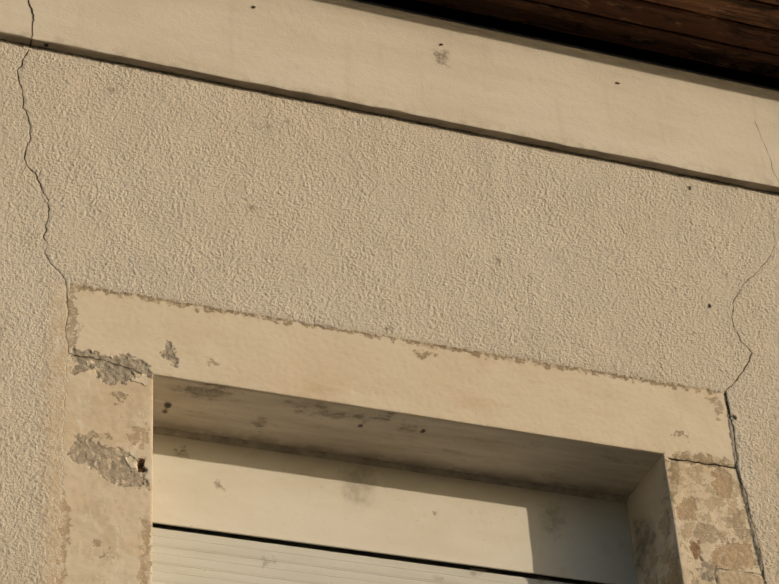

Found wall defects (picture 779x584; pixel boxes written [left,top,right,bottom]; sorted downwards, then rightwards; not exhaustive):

crack [17,0,153,379]
spalling [67,423,149,487]
spalling [66,288,153,386]
crack [668,211,774,584]